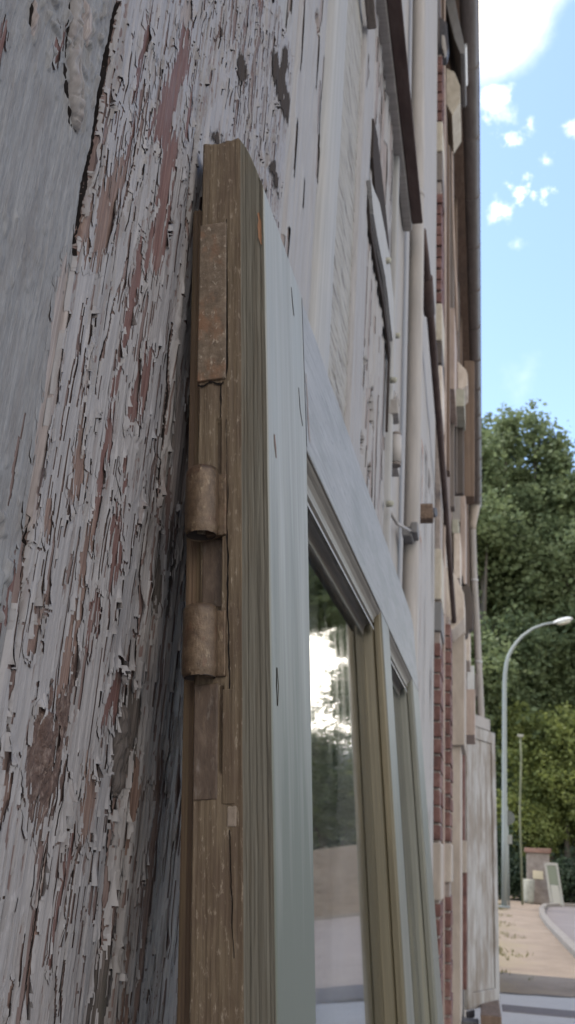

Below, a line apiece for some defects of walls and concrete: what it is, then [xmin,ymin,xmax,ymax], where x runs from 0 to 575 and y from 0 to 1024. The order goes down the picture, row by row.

peeling [0,0,196,1024]